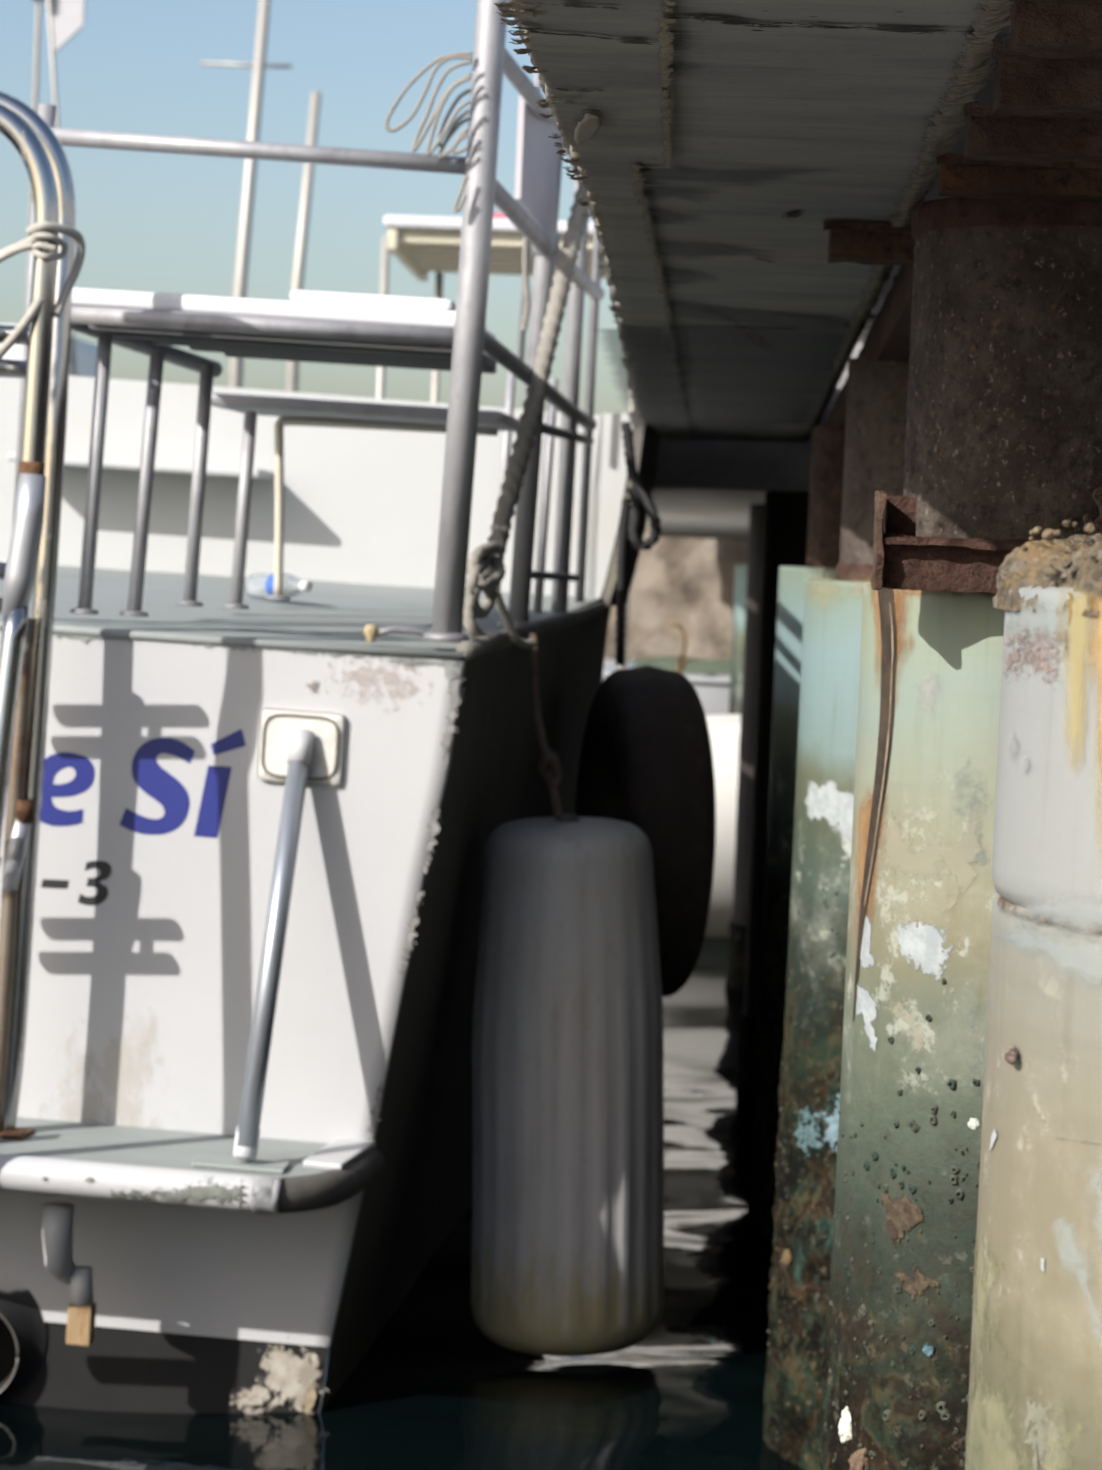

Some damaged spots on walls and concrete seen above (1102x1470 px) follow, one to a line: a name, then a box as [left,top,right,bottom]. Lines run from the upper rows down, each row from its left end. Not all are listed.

rust [873,589,963,664]
spalling [992,520,1102,690]
rust [1068,593,1102,764]
peeling [805,780,854,872]
rust [858,795,882,916]
peeling [860,915,874,968]
peeling [894,921,953,981]
peeling [856,985,923,1052]
peeling [793,1093,840,1157]